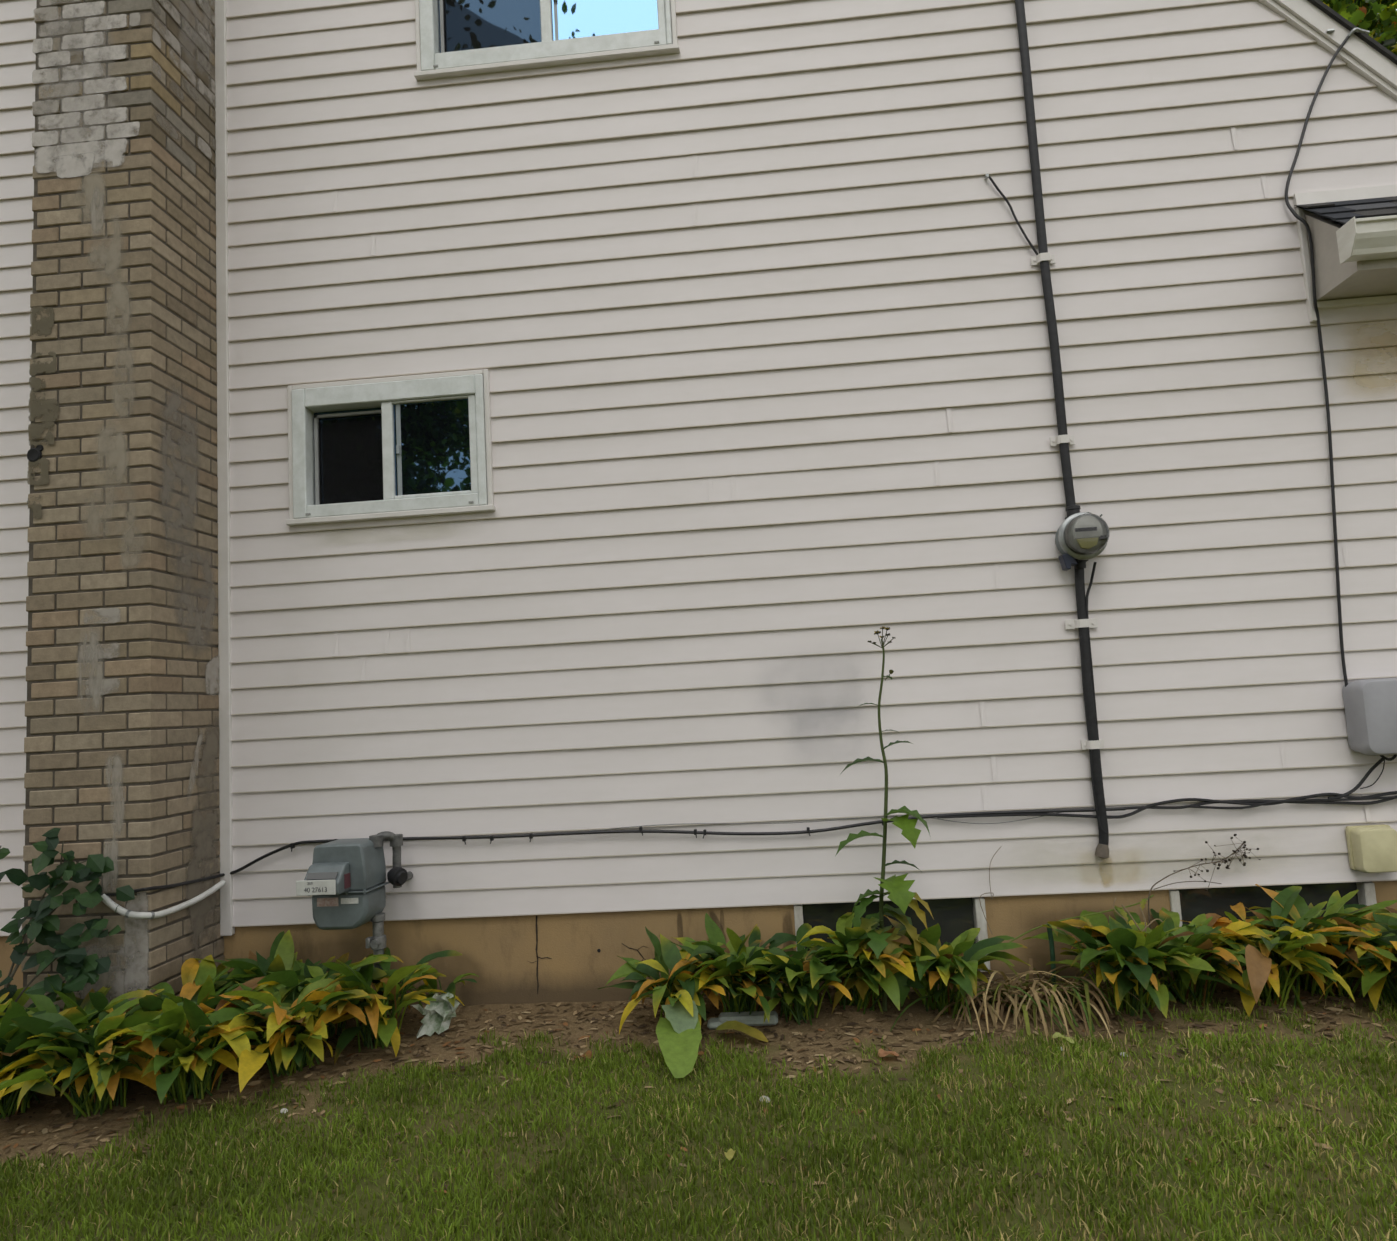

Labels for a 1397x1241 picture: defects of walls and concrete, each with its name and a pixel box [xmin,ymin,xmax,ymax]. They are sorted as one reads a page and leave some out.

water stain [32,0,216,333]
water stain [87,350,142,567]